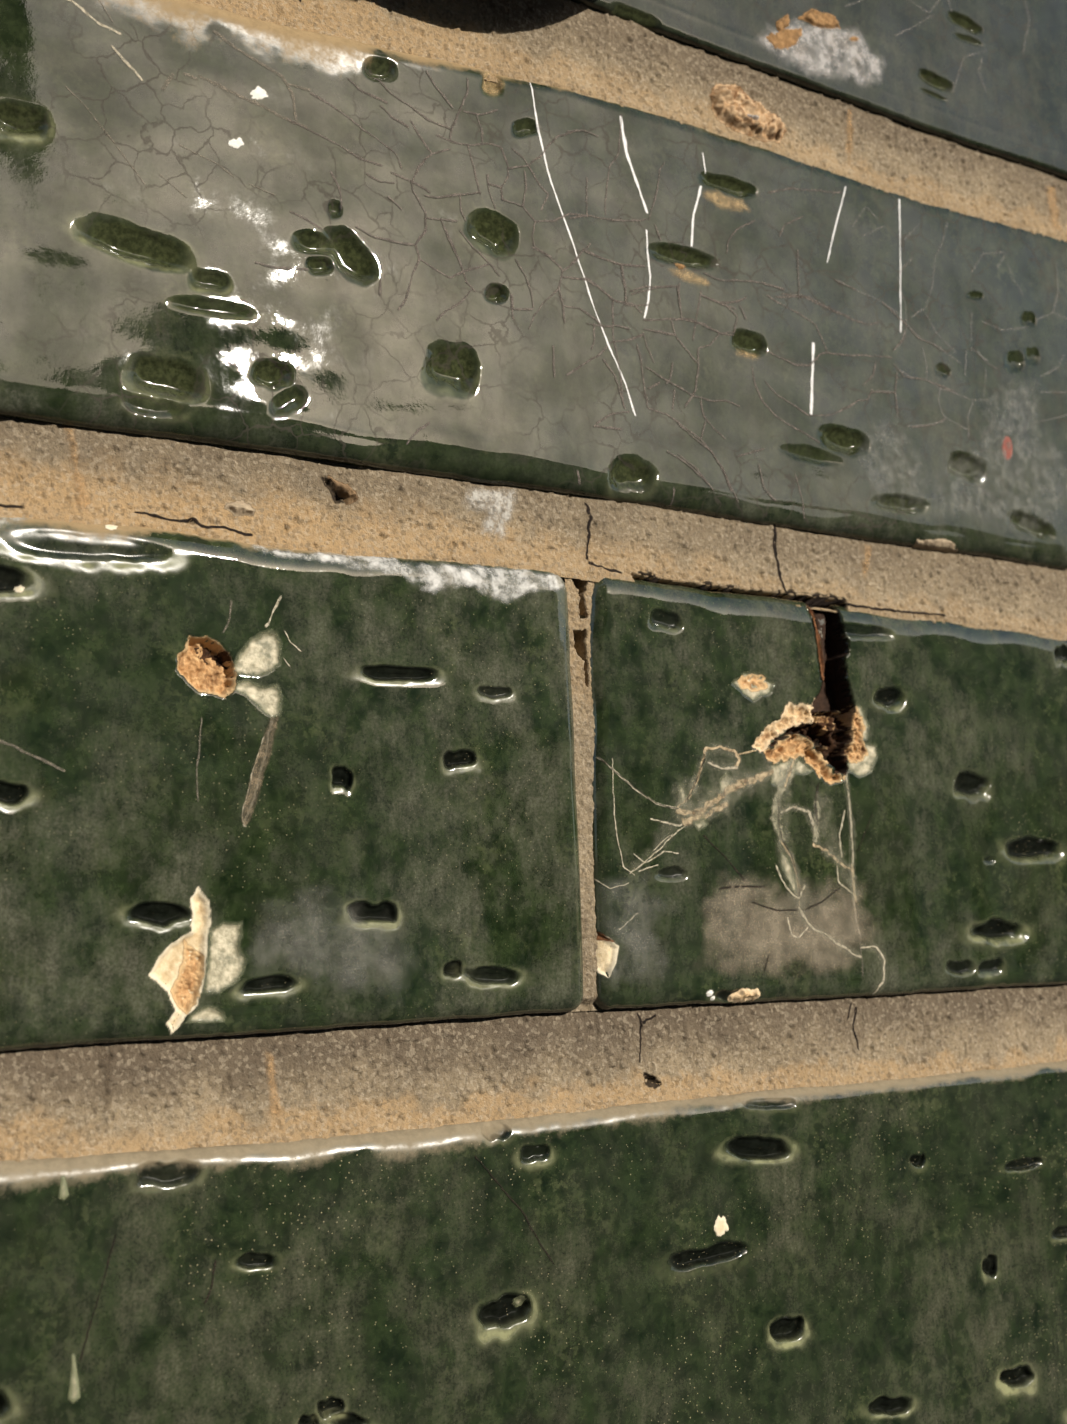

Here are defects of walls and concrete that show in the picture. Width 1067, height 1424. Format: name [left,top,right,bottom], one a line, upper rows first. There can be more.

spalling [766,9,859,50]
crack [68,0,1058,616]
crack [0,502,24,510]
peeling [177,632,281,825]
peeling [734,673,772,700]
spalling [752,605,904,786]
peeling [127,886,299,1034]
crack [598,746,885,1050]
crack [637,1014,656,1062]